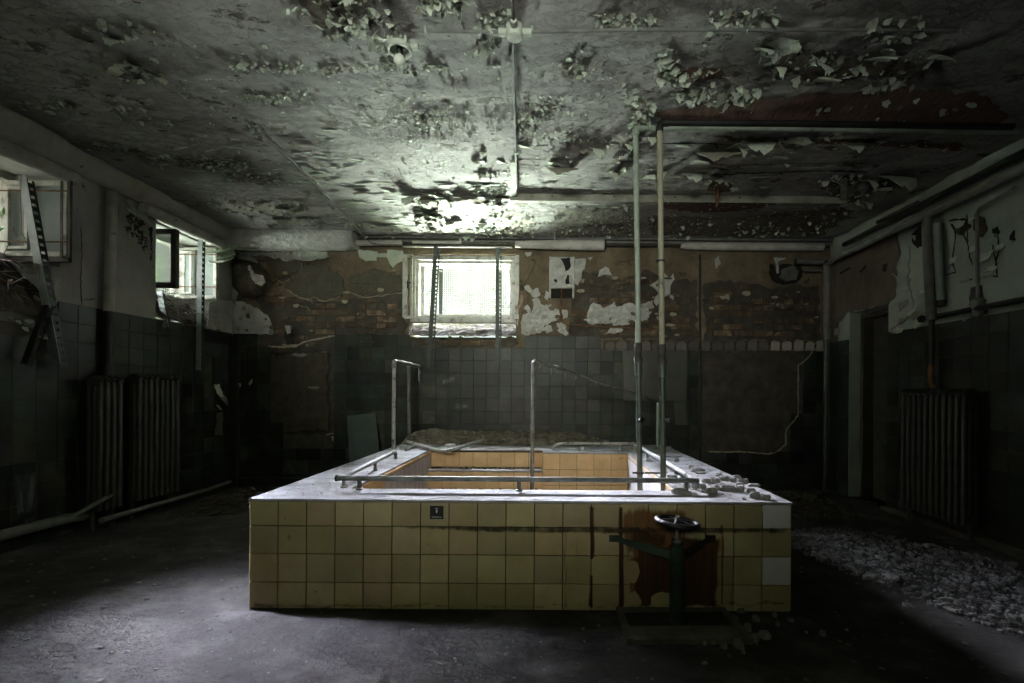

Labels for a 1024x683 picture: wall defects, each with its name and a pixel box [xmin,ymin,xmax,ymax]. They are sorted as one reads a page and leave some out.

flaking render [69,0,977,348]
spalling [949,214,1016,321]
corrosion [619,507,724,607]